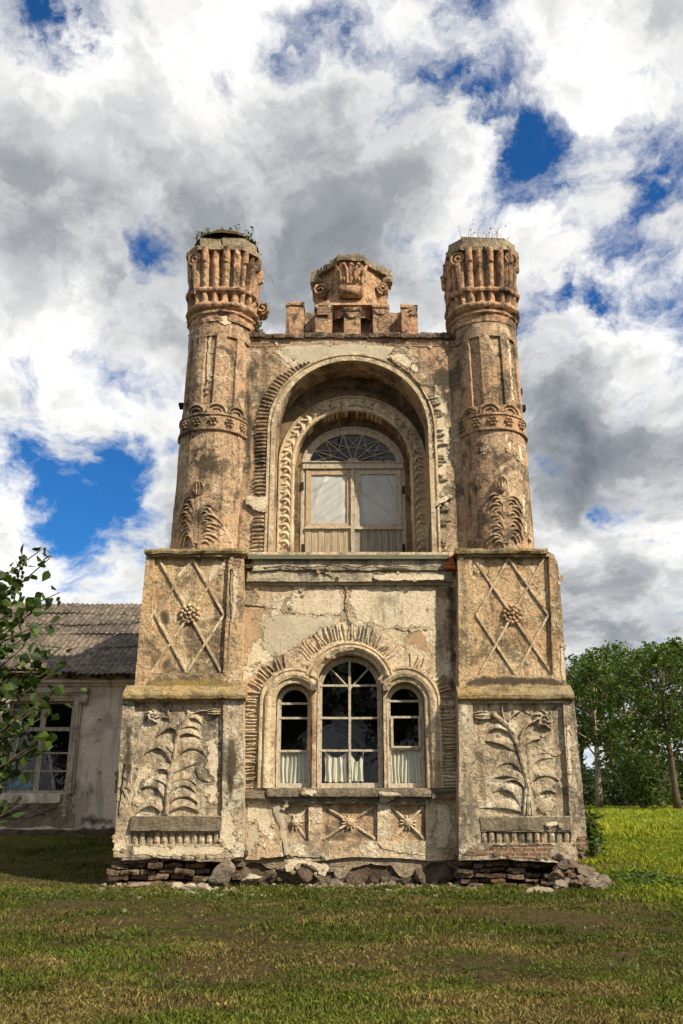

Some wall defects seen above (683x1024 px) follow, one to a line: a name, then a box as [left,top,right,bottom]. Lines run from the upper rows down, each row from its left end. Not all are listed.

peeling [209,557,444,672]
crack [263,564,435,625]
peeling [58,738,290,859]